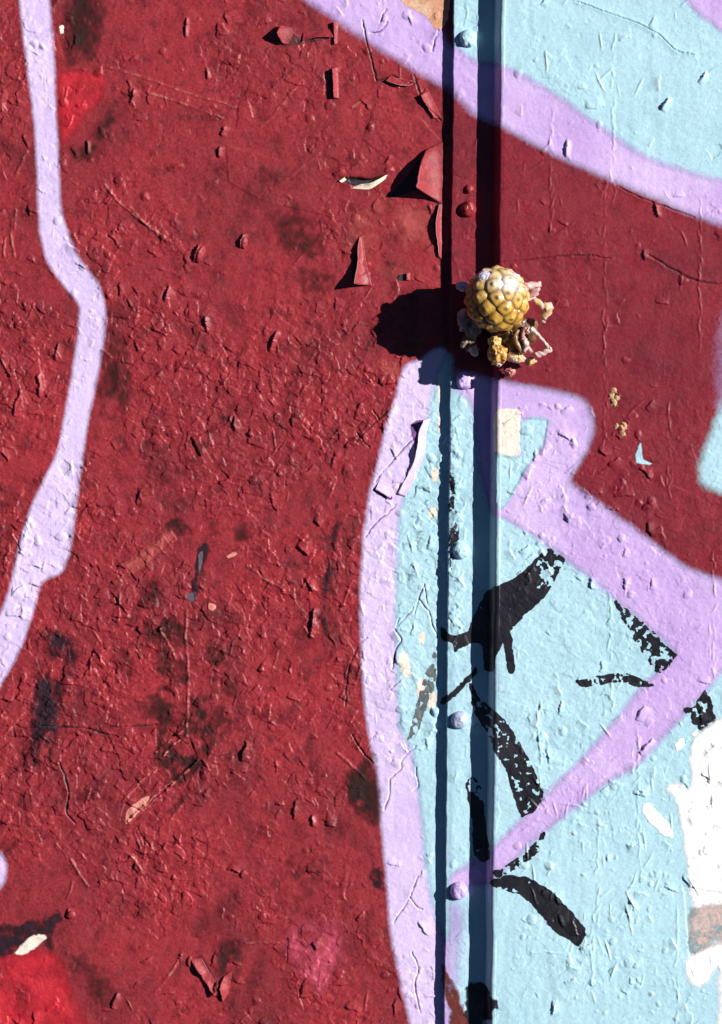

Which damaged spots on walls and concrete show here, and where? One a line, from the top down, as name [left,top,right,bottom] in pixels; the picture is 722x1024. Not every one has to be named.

peeling [276,21,338,46]
peeling [401,0,450,29]
peeling [339,175,387,189]
peeling [389,141,444,260]
peeling [351,234,372,287]
peeling [375,373,441,500]
peeling [492,408,548,509]
peeling [636,443,652,465]
peeling [398,651,437,710]
peeling [642,718,722,909]
peeling [190,956,233,1001]
peeling [685,940,722,1024]